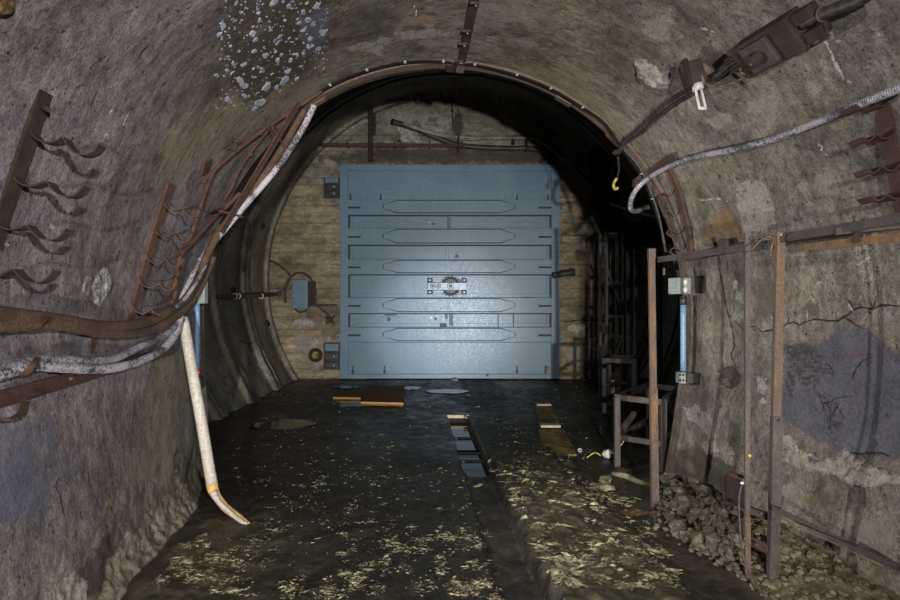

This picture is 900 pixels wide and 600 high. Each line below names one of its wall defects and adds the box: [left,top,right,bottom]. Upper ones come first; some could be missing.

peeling [214,0,328,111]
spalling [634,59,672,90]
crack [717,262,900,368]
water stain [785,344,841,429]
crack [818,357,873,430]
crack [849,451,890,459]